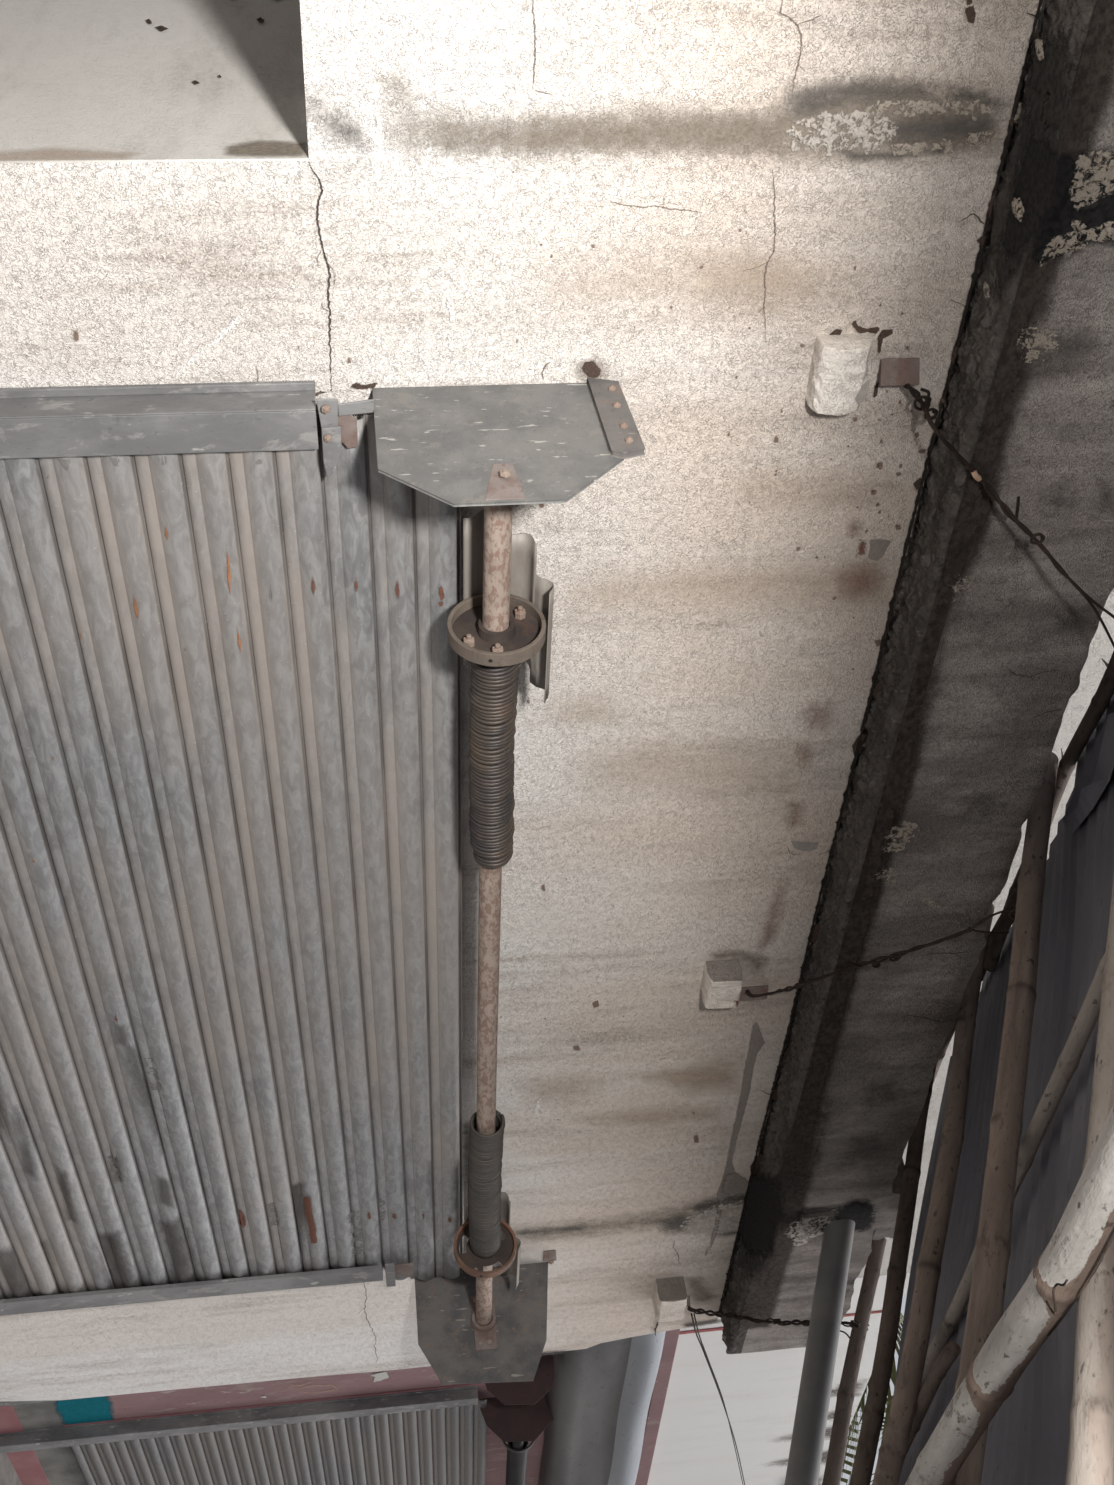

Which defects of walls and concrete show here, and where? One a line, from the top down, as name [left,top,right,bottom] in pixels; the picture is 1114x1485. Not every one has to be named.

damp [413,84,993,158]
crack [308,161,336,391]
damp [523,2,1114,1329]